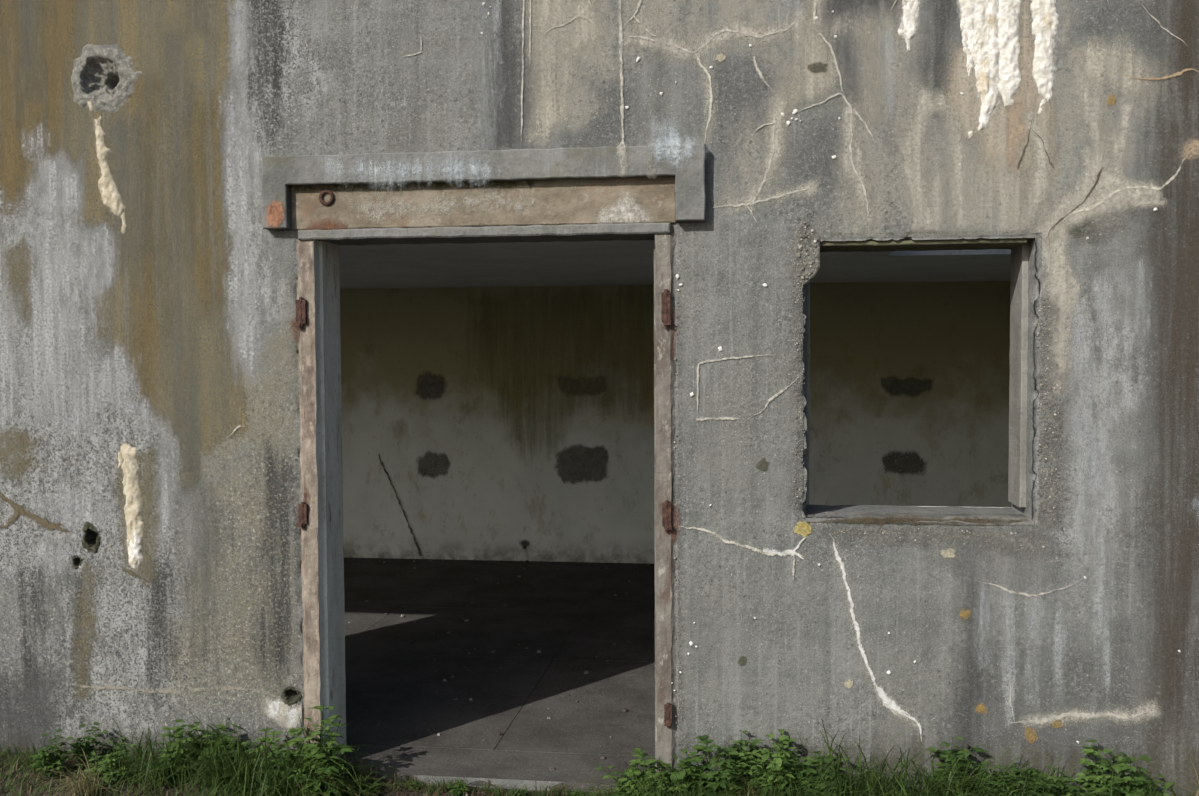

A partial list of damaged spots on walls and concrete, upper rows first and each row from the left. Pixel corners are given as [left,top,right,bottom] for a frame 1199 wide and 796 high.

spalling [71,44,142,113]
water stain [0,0,284,586]
rust [266,201,284,227]
crack [541,0,875,223]
water stain [624,0,919,236]
water stain [901,0,1165,404]
crack [1048,155,1188,244]
water stain [1172,0,1199,134]
crack [0,493,74,533]
crack [680,515,1028,742]
crack [1008,676,1156,724]
water stain [1004,540,1191,744]